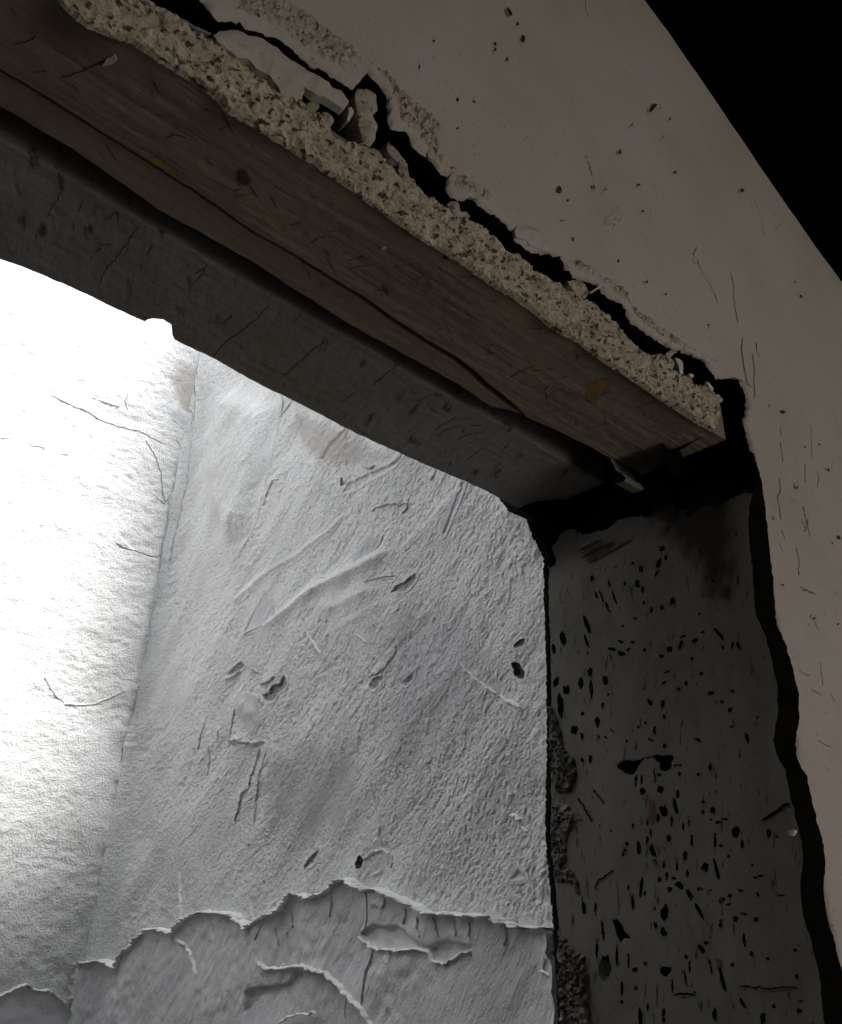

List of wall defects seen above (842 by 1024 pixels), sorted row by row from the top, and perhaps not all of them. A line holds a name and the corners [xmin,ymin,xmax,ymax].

crack [180,18,410,177]
flaking render [237,0,492,201]
crack [444,201,475,223]
crack [562,280,602,298]
flaking render [570,259,711,365]
crack [663,350,714,391]
spalling [588,544,743,751]
crack [198,708,235,776]
crack [234,748,267,846]
flaking render [0,613,647,1024]
spalling [620,760,770,961]
spalling [636,941,779,1024]